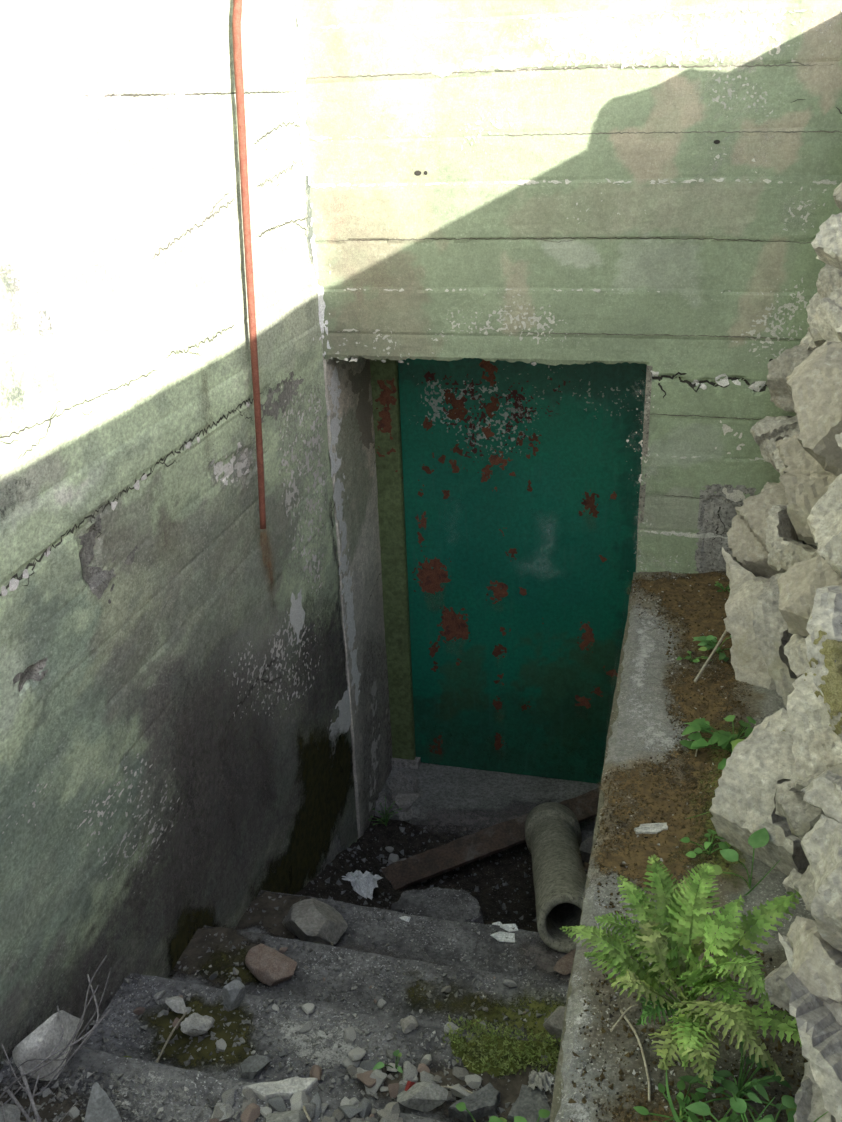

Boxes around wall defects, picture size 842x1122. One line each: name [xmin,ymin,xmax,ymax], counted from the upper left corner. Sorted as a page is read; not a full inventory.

peeling [705,63,781,117]
spalling [79,515,138,604]
crack [0,324,238,461]
crack [0,387,270,596]
peeling [208,437,256,488]
rust [412,511,471,672]
rust [418,444,469,497]
rust [441,389,468,424]
rust [479,359,533,492]
rust [579,490,623,518]
peeling [627,484,760,573]
crack [642,370,767,420]